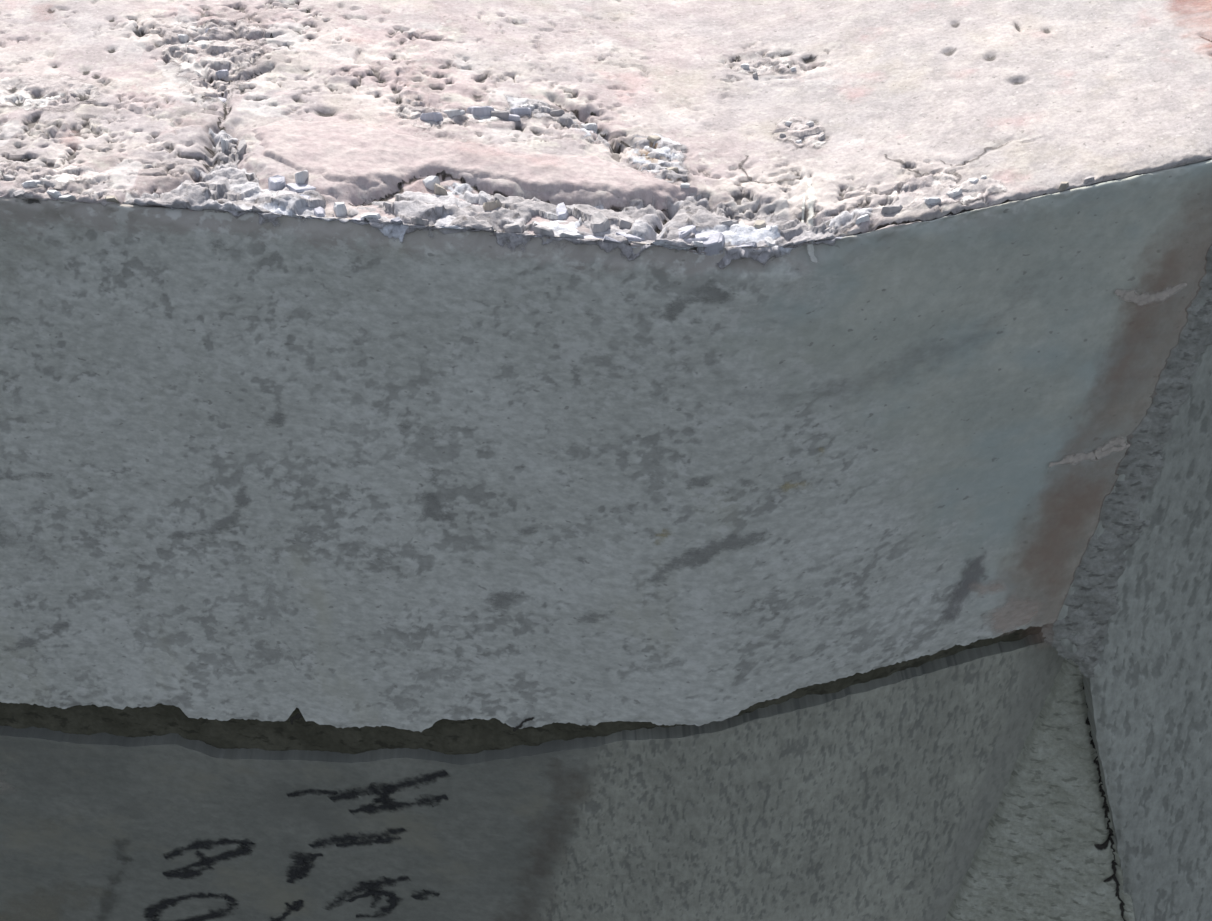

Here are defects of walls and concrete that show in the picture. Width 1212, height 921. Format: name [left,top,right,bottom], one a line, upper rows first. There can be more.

spalling [0,66,100,111]
crack [188,22,273,172]
spalling [733,54,816,78]
spalling [0,95,1007,269]
spalling [1059,176,1094,192]
crack [1083,686,1126,921]